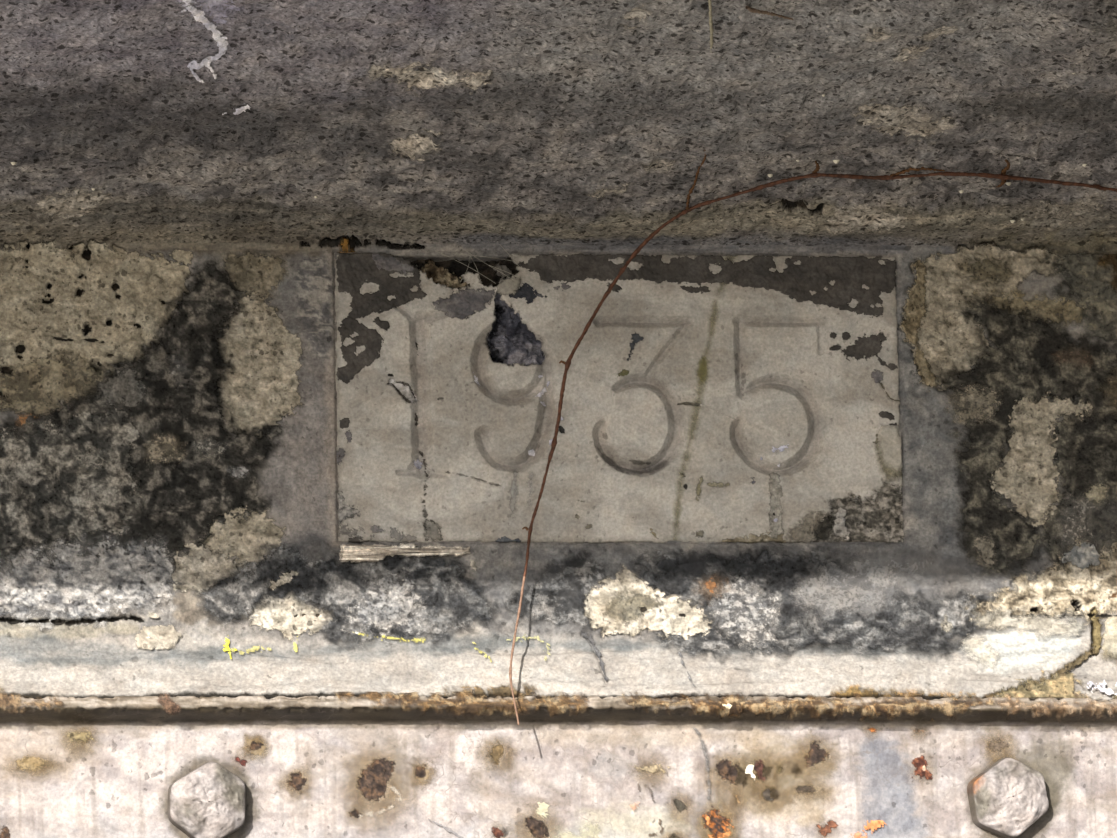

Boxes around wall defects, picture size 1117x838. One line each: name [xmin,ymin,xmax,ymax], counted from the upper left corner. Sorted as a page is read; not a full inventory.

peeling [336,242,1084,391]
water stain [0,261,283,631]
water stain [941,243,1117,575]
crack [0,616,144,625]
spalling [249,595,332,640]
spalling [584,565,712,640]
water stain [707,578,778,645]
crack [982,608,1117,699]
corrosion [336,692,588,717]
corrosion [626,692,1117,732]
corrosion [348,753,433,818]
corrosion [674,738,834,838]